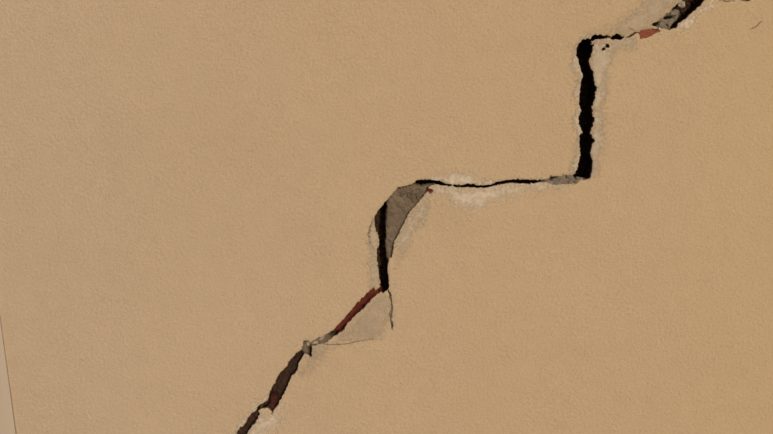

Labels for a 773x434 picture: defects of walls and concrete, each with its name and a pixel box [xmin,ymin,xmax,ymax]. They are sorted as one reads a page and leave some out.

peeling [677,0,718,32]
peeling [570,0,686,178]
spalling [368,172,568,290]
crack [236,0,704,434]
peeling [233,390,281,434]